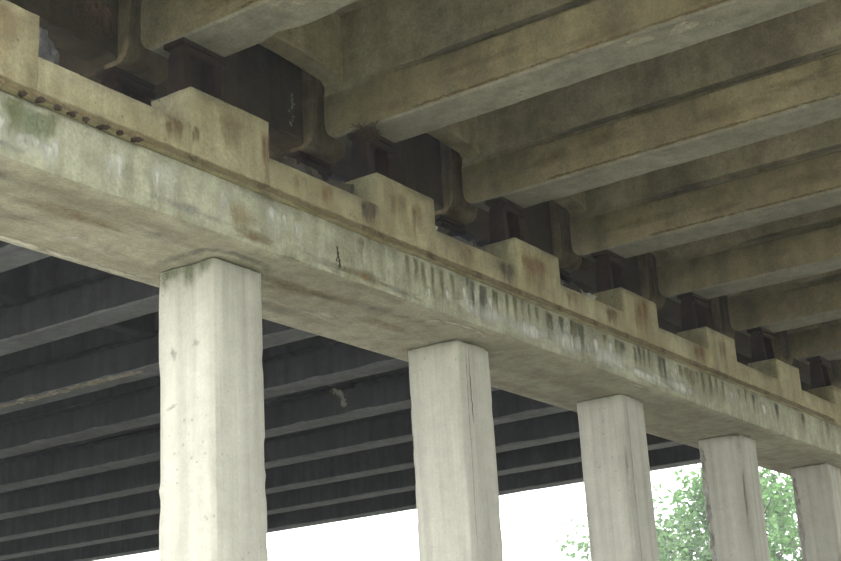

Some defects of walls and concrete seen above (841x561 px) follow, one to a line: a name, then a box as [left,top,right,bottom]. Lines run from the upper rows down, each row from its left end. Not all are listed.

damp [0,72,833,422]